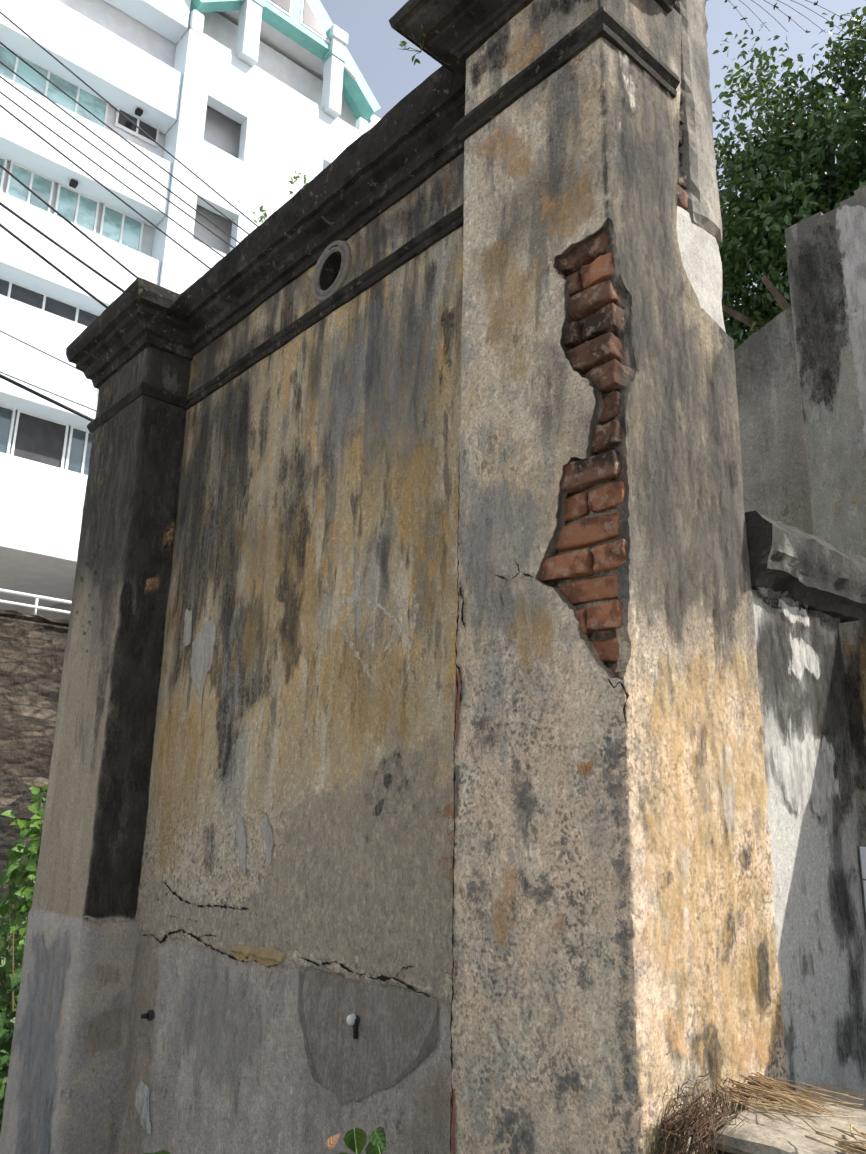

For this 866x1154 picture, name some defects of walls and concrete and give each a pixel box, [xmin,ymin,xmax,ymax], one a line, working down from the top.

damp [318,290,454,455]
spalling [538,230,634,678]
damp [613,59,749,675]
damp [82,361,319,919]
crack [78,451,466,1154]
mould [366,751,421,827]
damp [696,1023,722,1080]
damp [724,914,735,964]
damp [743,846,751,869]
damp [752,936,771,1007]
damp [757,597,866,839]
damp [830,868,866,1079]